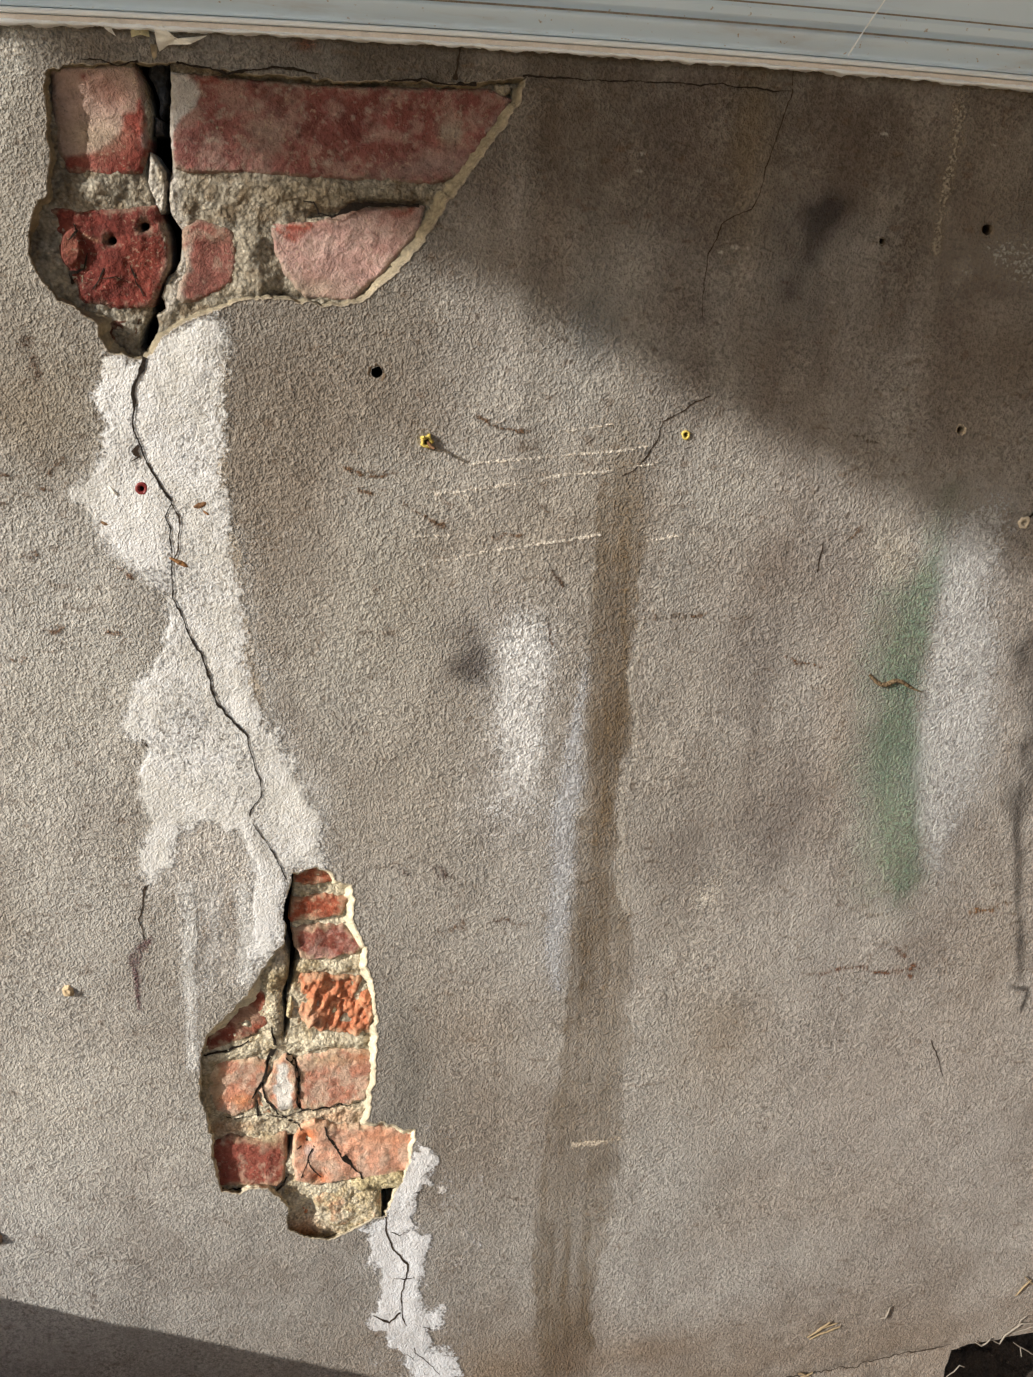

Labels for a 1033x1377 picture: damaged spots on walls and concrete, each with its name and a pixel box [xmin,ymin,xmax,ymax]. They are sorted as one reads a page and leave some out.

flaking render [27,18,528,360]
crack [523,71,794,317]
crack [131,357,288,880]
water stain [546,507,644,990]
flaking render [198,866,416,1241]
crack [373,1216,440,1375]
crack [787,1344,951,1377]